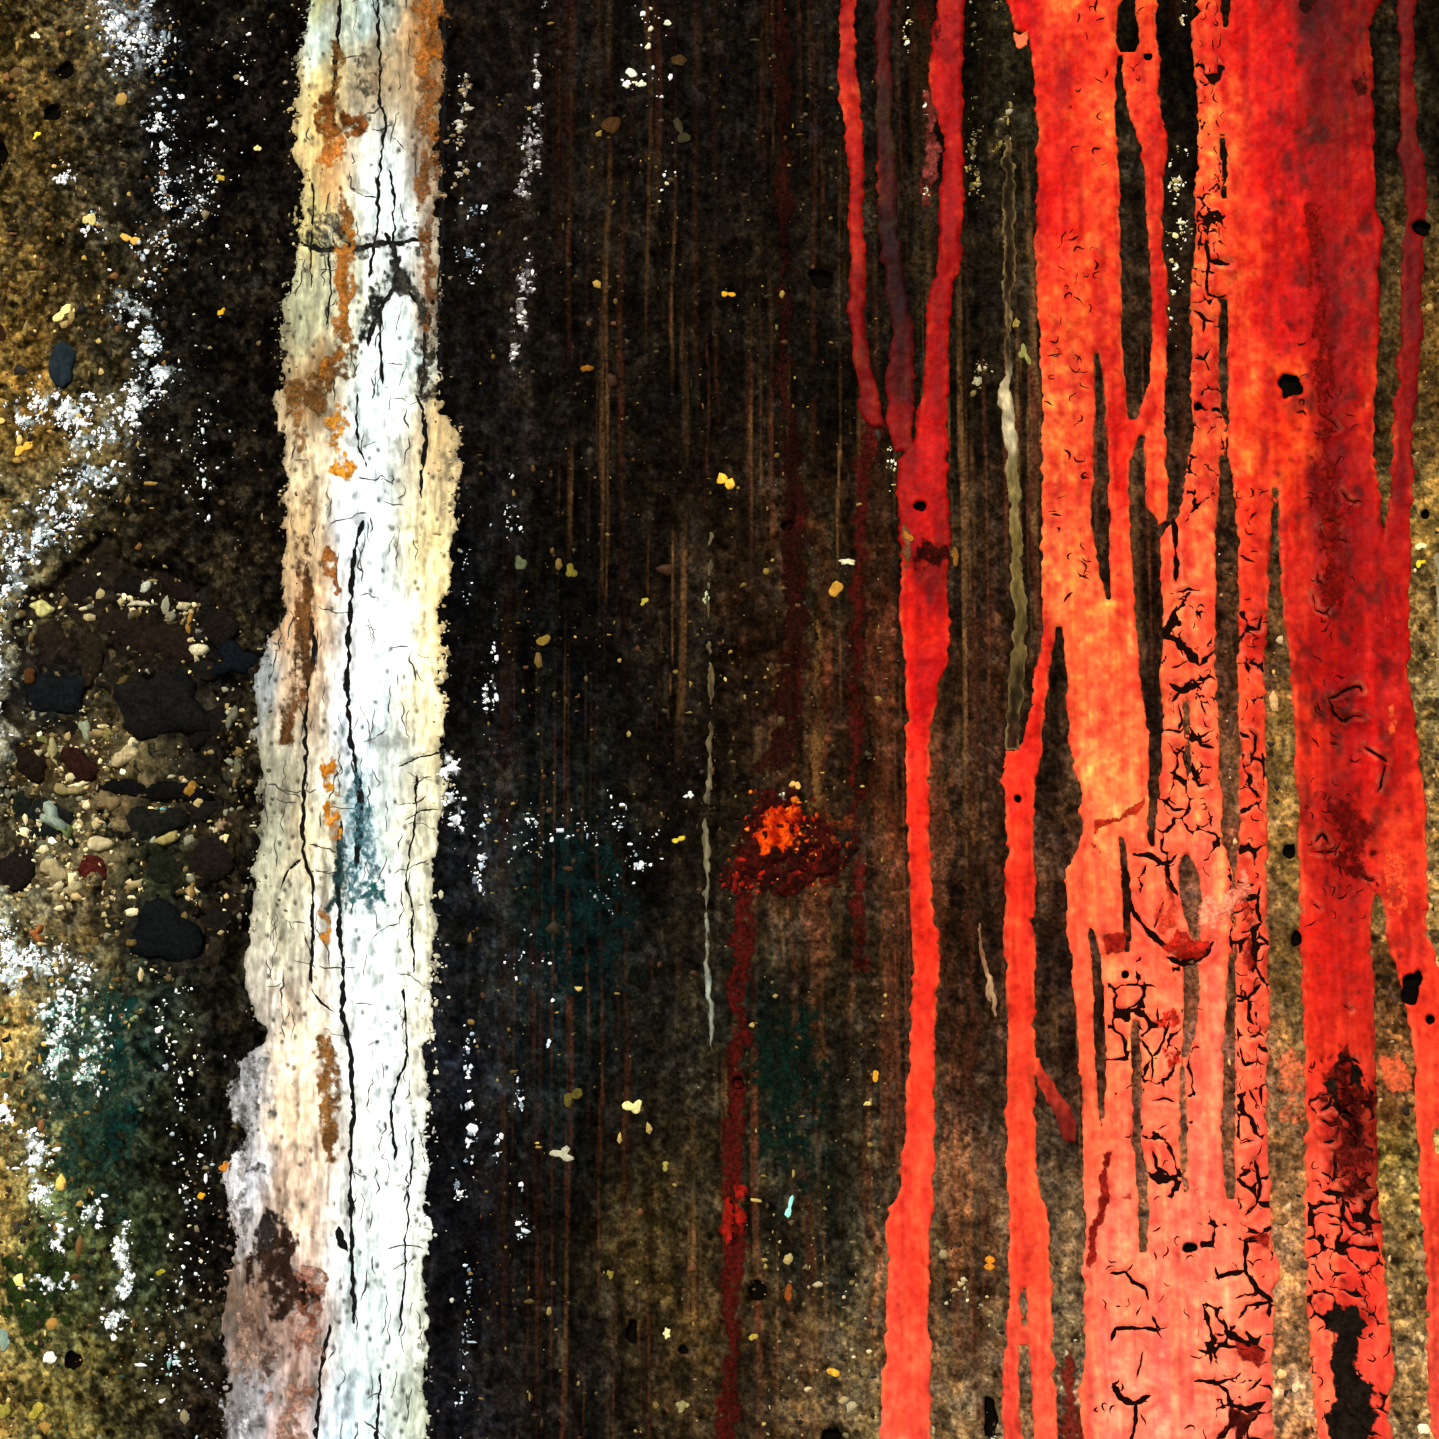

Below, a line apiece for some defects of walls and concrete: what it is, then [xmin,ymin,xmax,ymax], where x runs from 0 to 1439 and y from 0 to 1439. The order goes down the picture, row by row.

rust [313,40,369,168]
rust [411,0,445,332]
damp [621,7,673,106]
crack [1068,61,1140,165]
crack [1077,0,1144,40]
rust [283,186,359,481]
rust [279,536,341,746]
rust [319,759,342,841]
damp [0,0,663,1439]
crack [262,0,448,1439]
crack [1093,2,1390,1439]
rust [312,1035,345,1163]